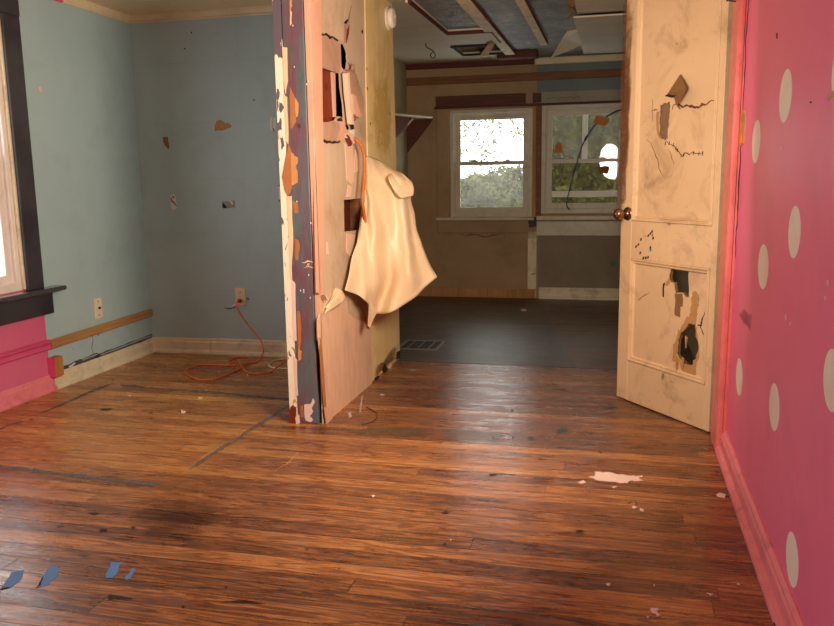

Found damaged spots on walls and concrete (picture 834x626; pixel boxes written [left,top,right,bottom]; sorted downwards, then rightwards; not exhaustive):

peeling [214,120,231,131]
peeling [310,0,349,301]
peeling [345,143,359,197]
crack [652,100,714,111]
crack [665,140,703,157]
peeling [270,47,322,424]
peeling [346,234,355,256]
spalling [672,291,700,375]